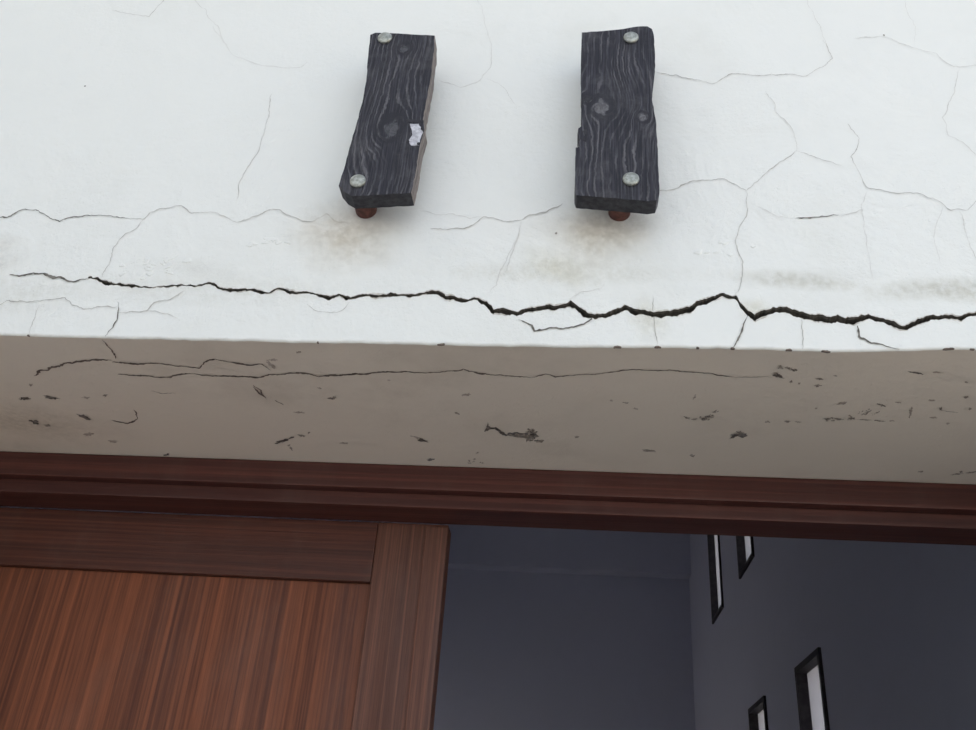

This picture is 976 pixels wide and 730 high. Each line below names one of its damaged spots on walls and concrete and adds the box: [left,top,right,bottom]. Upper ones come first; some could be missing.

crack [0,0,976,404]
spalling [824,402,913,422]
spalling [484,424,544,443]